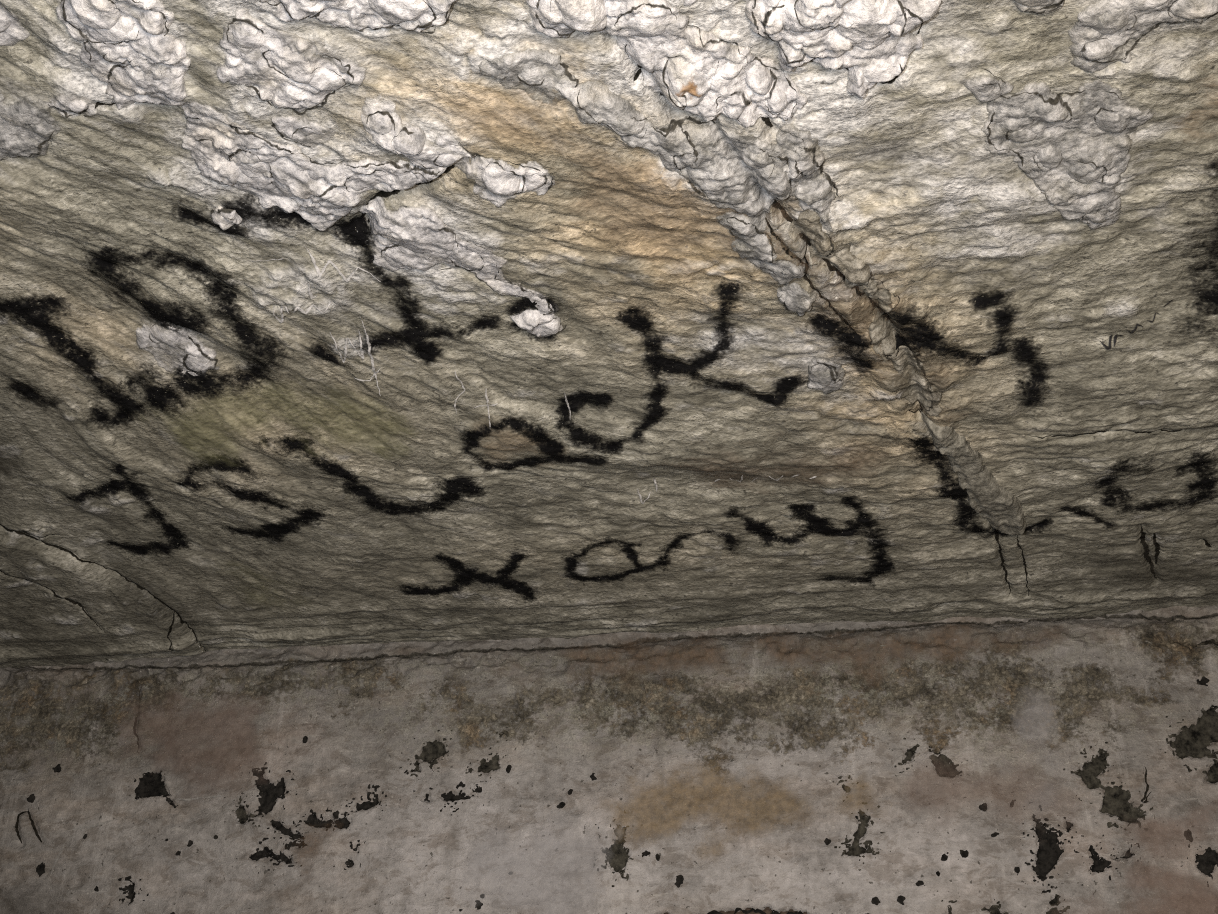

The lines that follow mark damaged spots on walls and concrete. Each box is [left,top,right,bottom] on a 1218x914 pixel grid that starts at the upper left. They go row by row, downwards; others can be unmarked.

damp [0,0,566,337]
damp [478,0,943,417]
damp [961,0,1218,229]
damp [136,323,220,376]
crack [0,524,1218,753]
peeling [134,770,178,808]
peeling [224,761,387,876]
peeling [593,810,660,887]
peeling [824,774,891,871]
spalling [916,850,969,886]
peeling [1010,742,1155,914]
peeling [1160,705,1218,783]